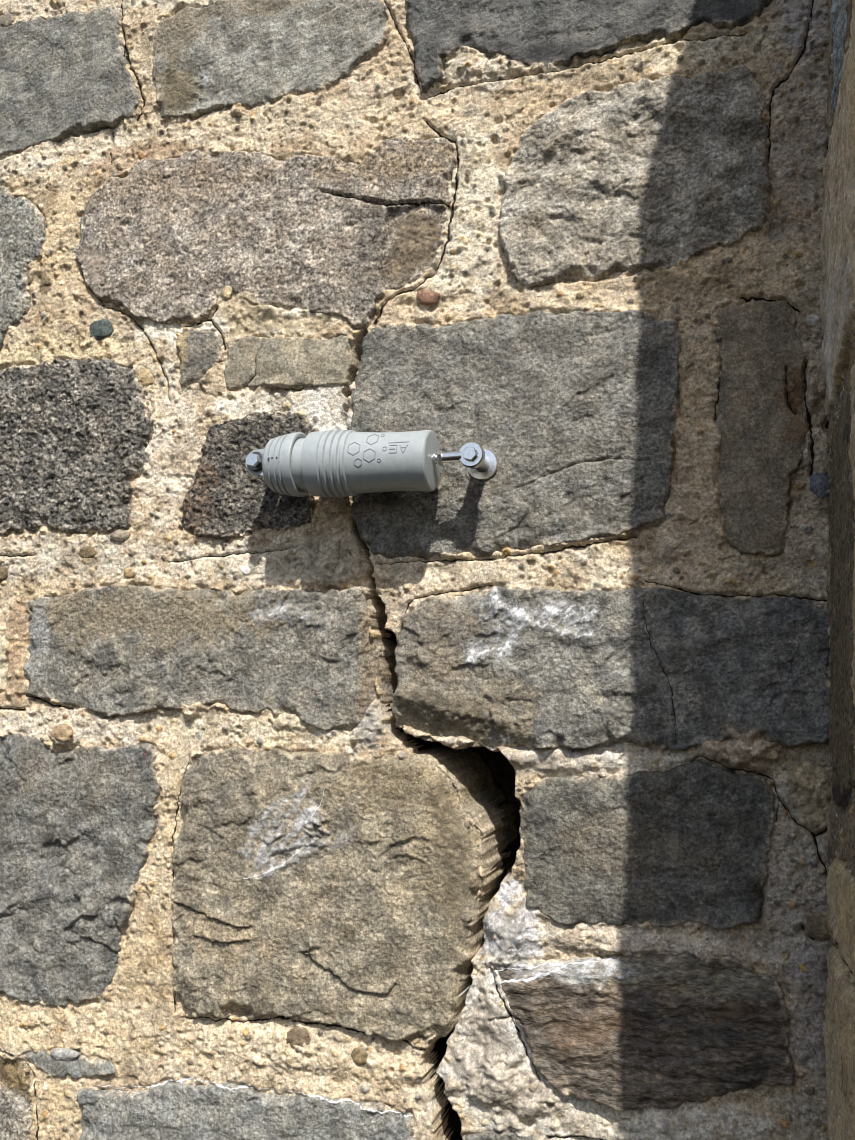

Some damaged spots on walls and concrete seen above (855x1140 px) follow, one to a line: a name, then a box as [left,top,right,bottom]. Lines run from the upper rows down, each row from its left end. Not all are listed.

crack [368,537,637,644]
crack [172,758,247,944]
crack [386,691,521,891]
crack [643,581,828,875]
crack [173,964,463,1140]
crack [469,942,540,1080]